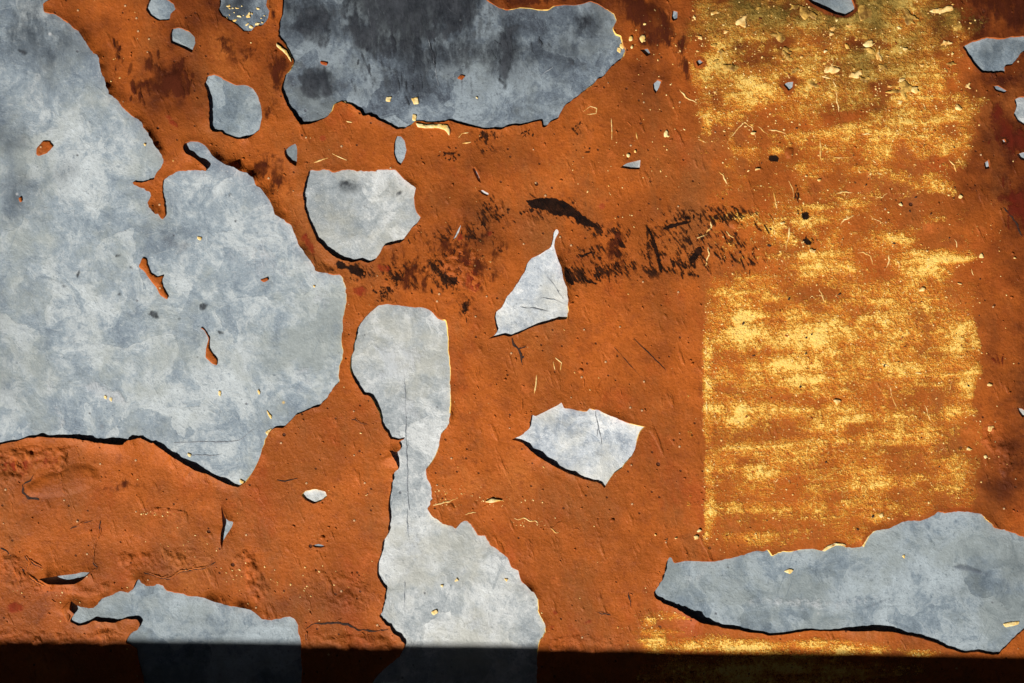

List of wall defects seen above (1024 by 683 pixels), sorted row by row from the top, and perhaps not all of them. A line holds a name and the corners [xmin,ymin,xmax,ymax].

peeling [0,0,657,683]
peeling [628,0,1024,683]